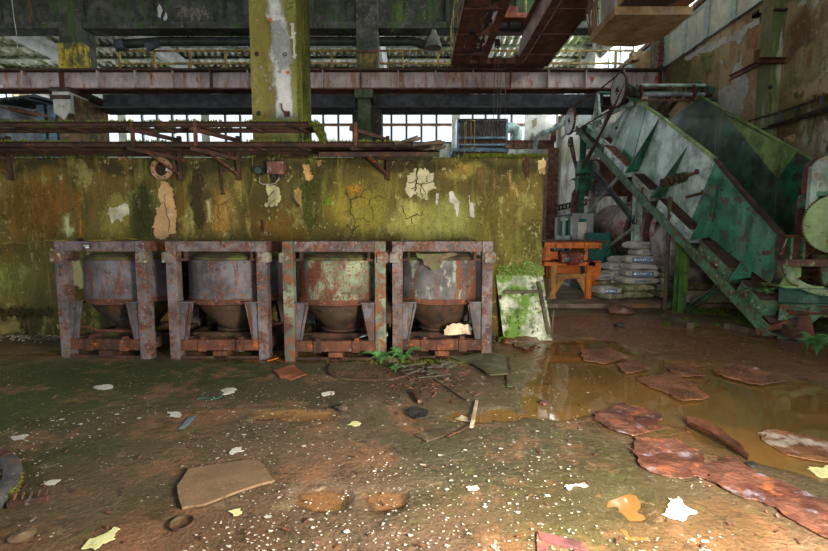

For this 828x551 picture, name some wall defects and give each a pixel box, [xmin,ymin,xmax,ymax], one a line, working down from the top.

peeling [107,203,129,224]
flaking render [152,181,177,240]
damp [188,173,206,229]
flaking render [405,168,439,203]
damp [0,306,58,319]